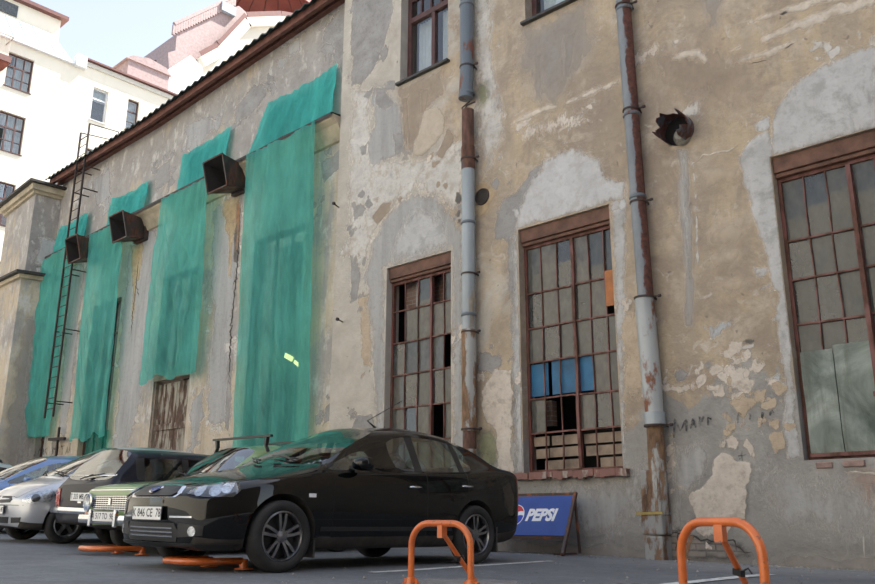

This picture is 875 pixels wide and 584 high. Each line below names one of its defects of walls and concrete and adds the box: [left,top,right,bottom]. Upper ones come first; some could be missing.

flaking render [318,0,462,378]
crack [228,224,240,384]
flaking render [477,344,521,473]
spalling [662,339,796,560]
crack [672,531,752,553]